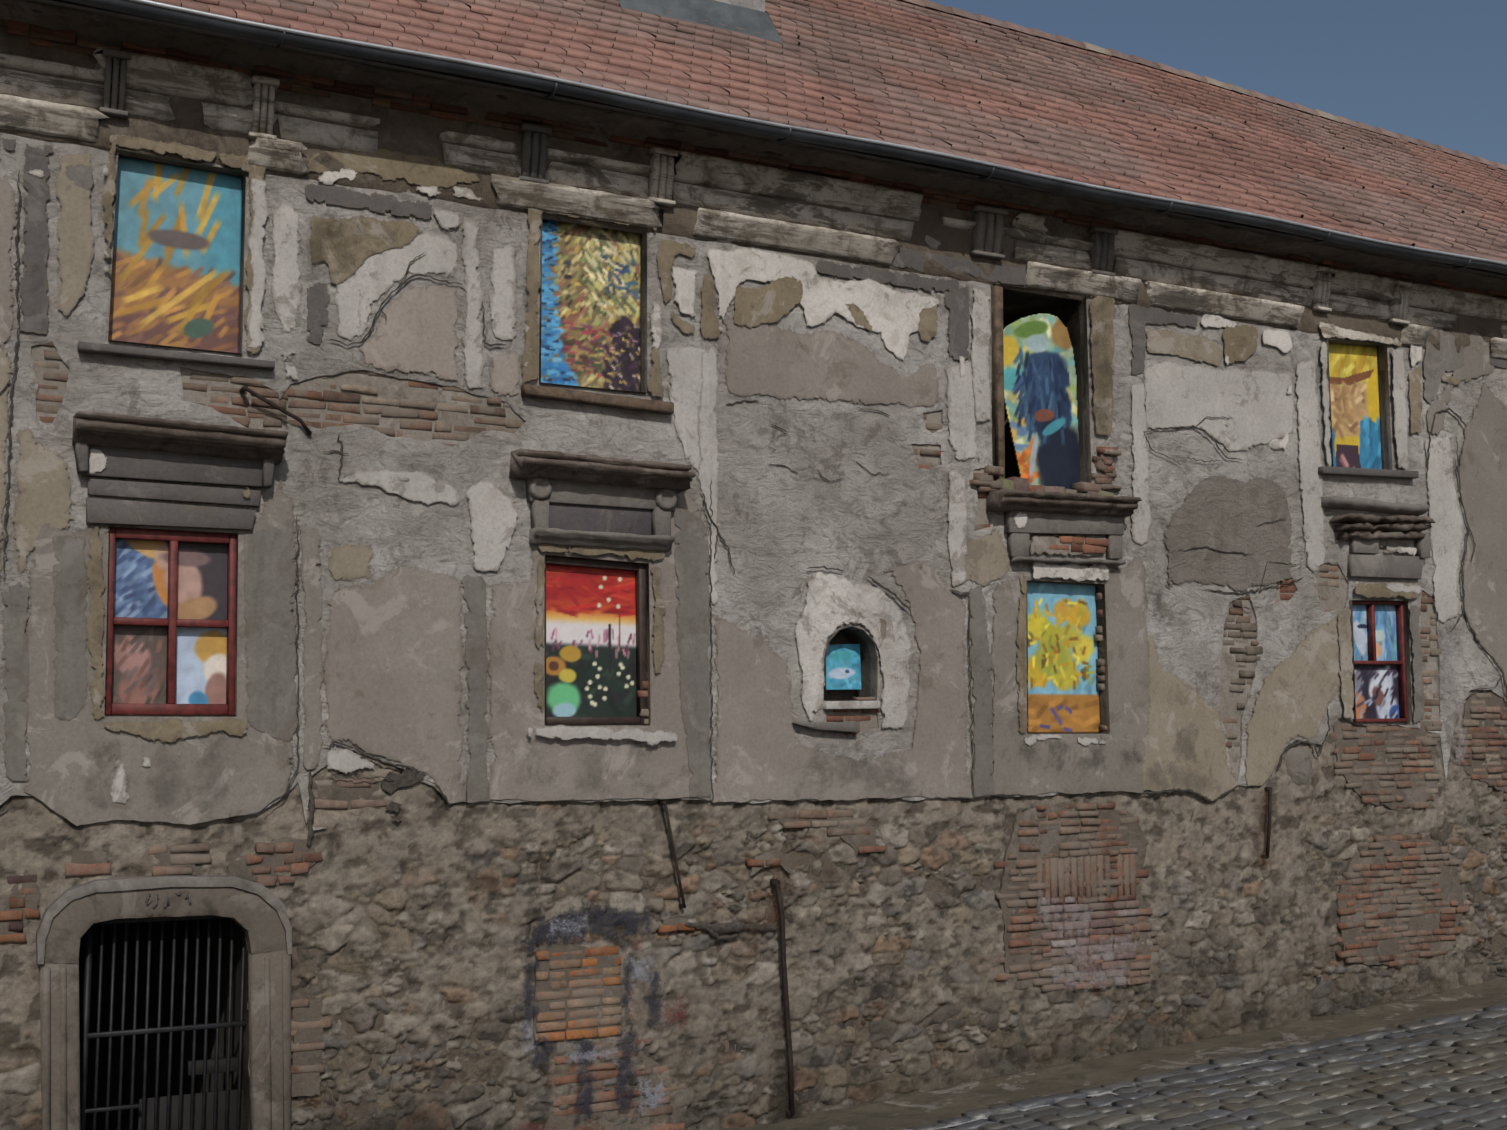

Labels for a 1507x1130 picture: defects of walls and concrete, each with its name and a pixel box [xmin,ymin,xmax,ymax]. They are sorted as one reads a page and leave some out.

crack [329,251,507,347]
flaking render [650,240,940,359]
spalling [180,367,525,446]
crack [1427,407,1507,699]
flaking render [110,757,151,804]
spalling [315,748,425,822]
spalling [1220,595,1263,793]
spalling [1331,591,1507,860]
spalling [0,869,40,943]
spalling [147,836,323,887]
spalling [1335,834,1470,967]
spalling [533,943,695,1130]